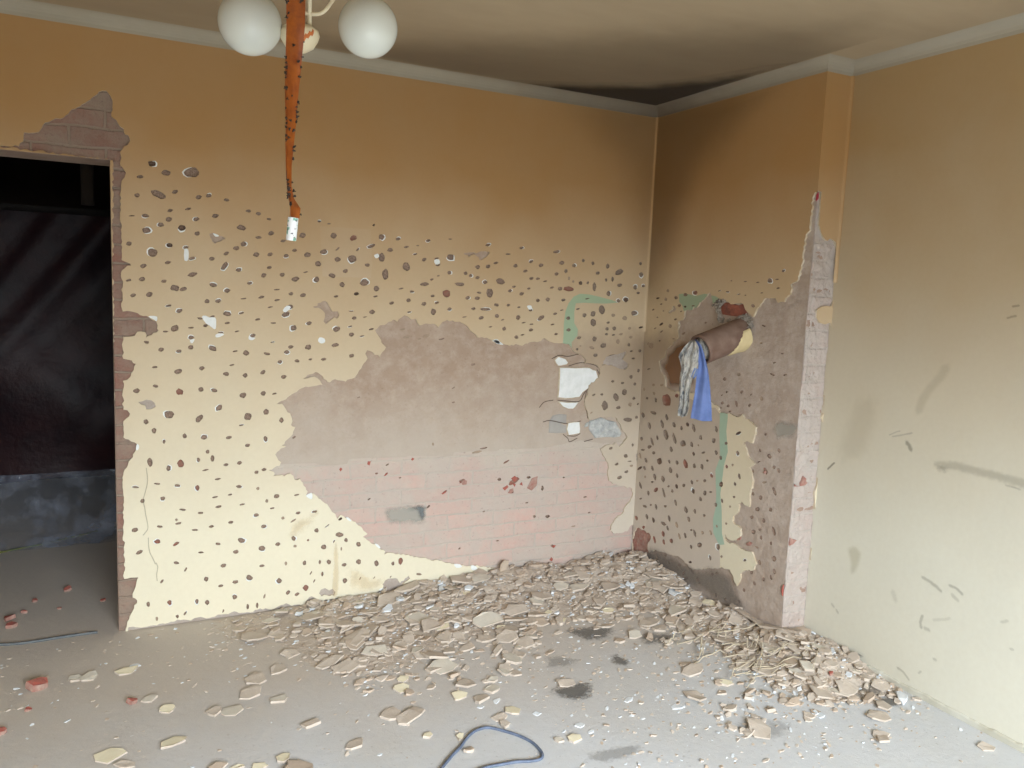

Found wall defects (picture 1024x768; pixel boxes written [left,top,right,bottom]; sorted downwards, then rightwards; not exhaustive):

flaking render [0,91,892,744]
crack [539,354,615,442]